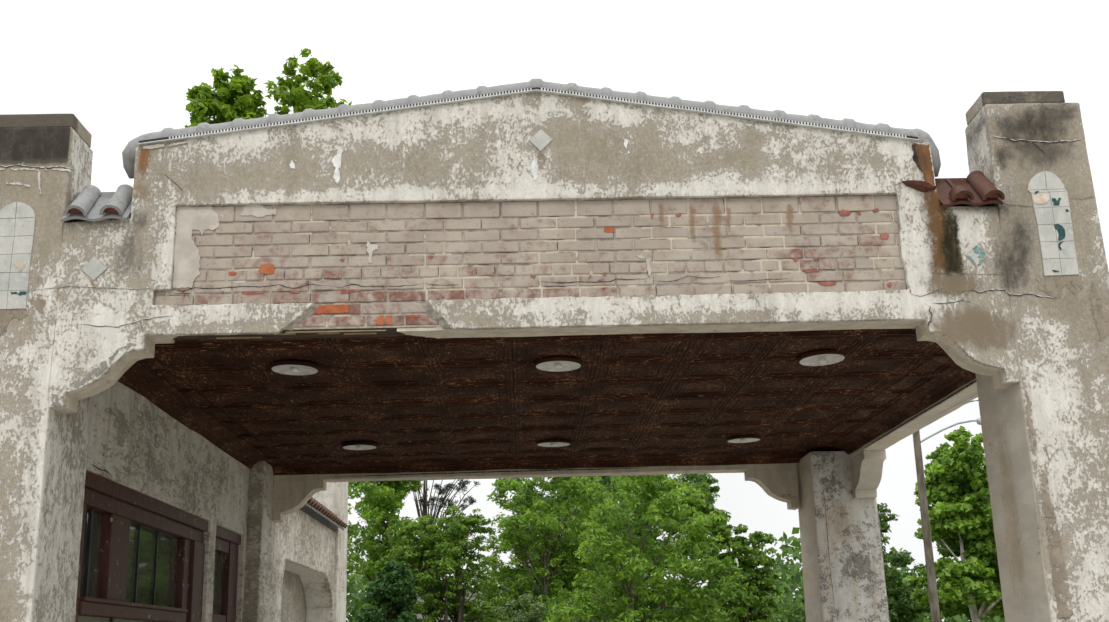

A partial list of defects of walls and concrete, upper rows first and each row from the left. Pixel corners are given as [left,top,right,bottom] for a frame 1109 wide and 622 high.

crack [993,136,1082,151]
peeling [330,146,347,184]
rust [714,207,730,253]
spalling [838,208,880,216]
spalling [259,264,275,274]
spalling [793,257,837,286]
leakage [929,214,980,295]
flaking render [282,289,449,331]
leakage [918,306,1015,348]
crack [910,272,1054,326]
peeling [1024,388,1037,457]
peeling [1041,473,1073,621]